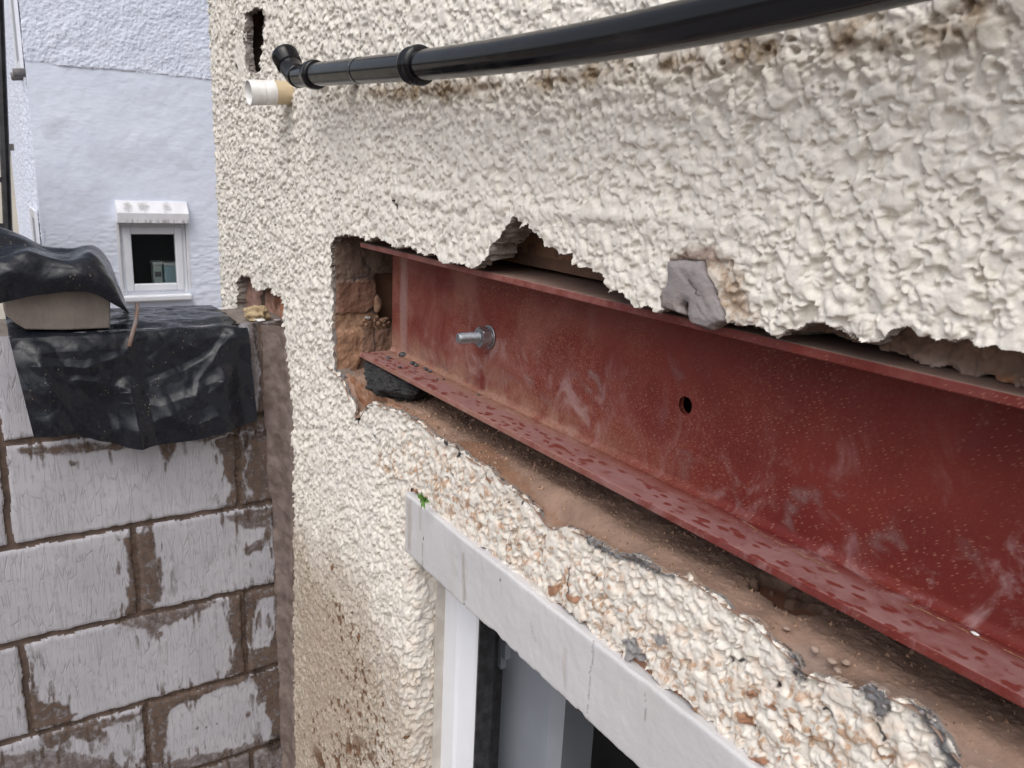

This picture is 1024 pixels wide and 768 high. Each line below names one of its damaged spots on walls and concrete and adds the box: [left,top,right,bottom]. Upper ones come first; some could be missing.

spalling [244,7,266,74]
spalling [444,216,548,269]
spalling [235,274,284,322]
spalling [775,321,1024,387]
spalling [330,234,979,768]